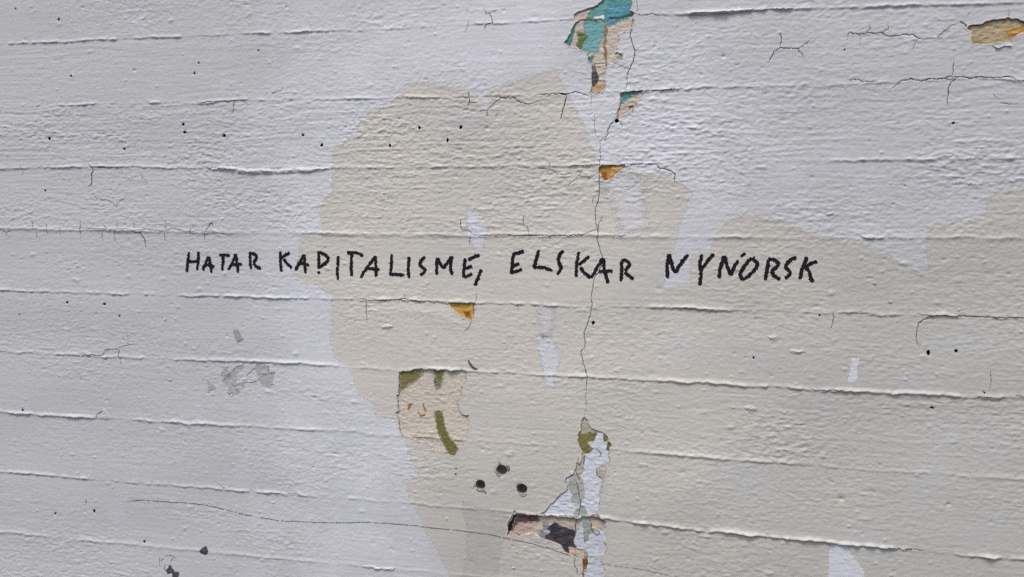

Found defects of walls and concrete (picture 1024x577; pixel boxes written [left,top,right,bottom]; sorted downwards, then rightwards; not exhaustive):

peeling [563,0,636,94]
crack [618,0,683,92]
crack [848,12,971,48]
peeling [965,16,1024,48]
peeling [616,89,645,119]
crack [854,63,1024,106]
peeling [597,163,626,182]
crack [449,91,622,413]
peeling [447,301,476,322]
peeling [395,367,470,457]
peeling [506,416,612,577]